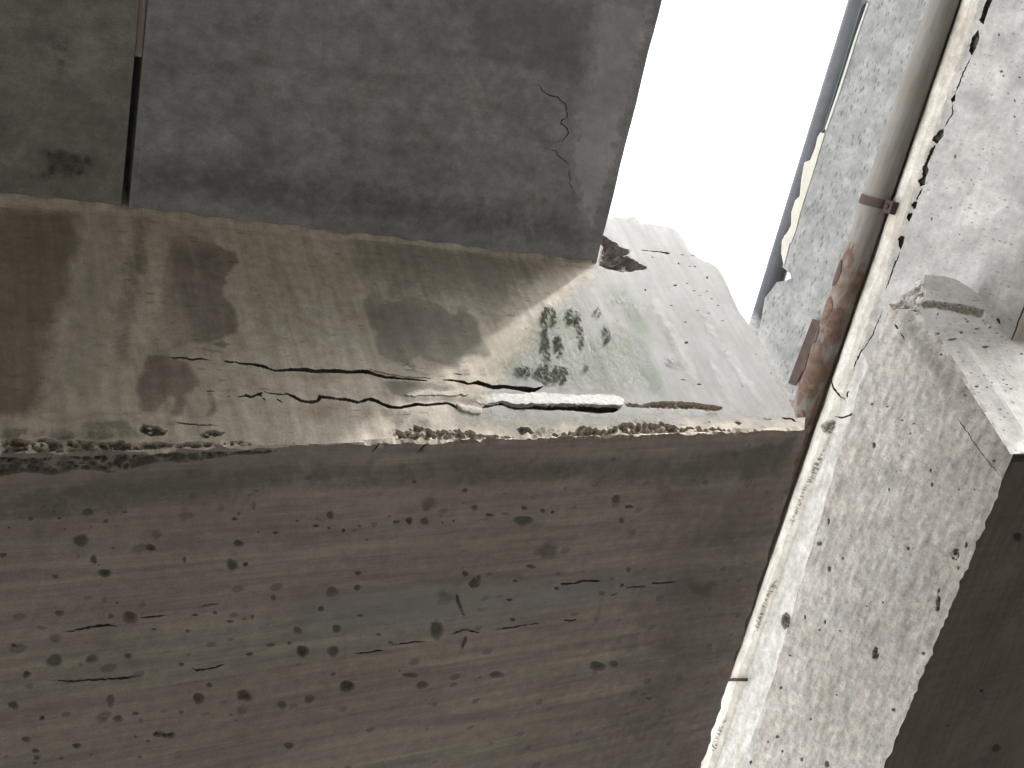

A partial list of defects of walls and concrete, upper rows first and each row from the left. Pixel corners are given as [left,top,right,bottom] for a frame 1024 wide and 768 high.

crack [535,84,573,189]
peeling [781,3,869,265]
spalling [598,236,647,273]
leakage [465,0,791,435]
crack [831,0,992,419]
spalling [889,278,1001,324]
crack [169,357,618,414]
spalling [0,424,299,477]